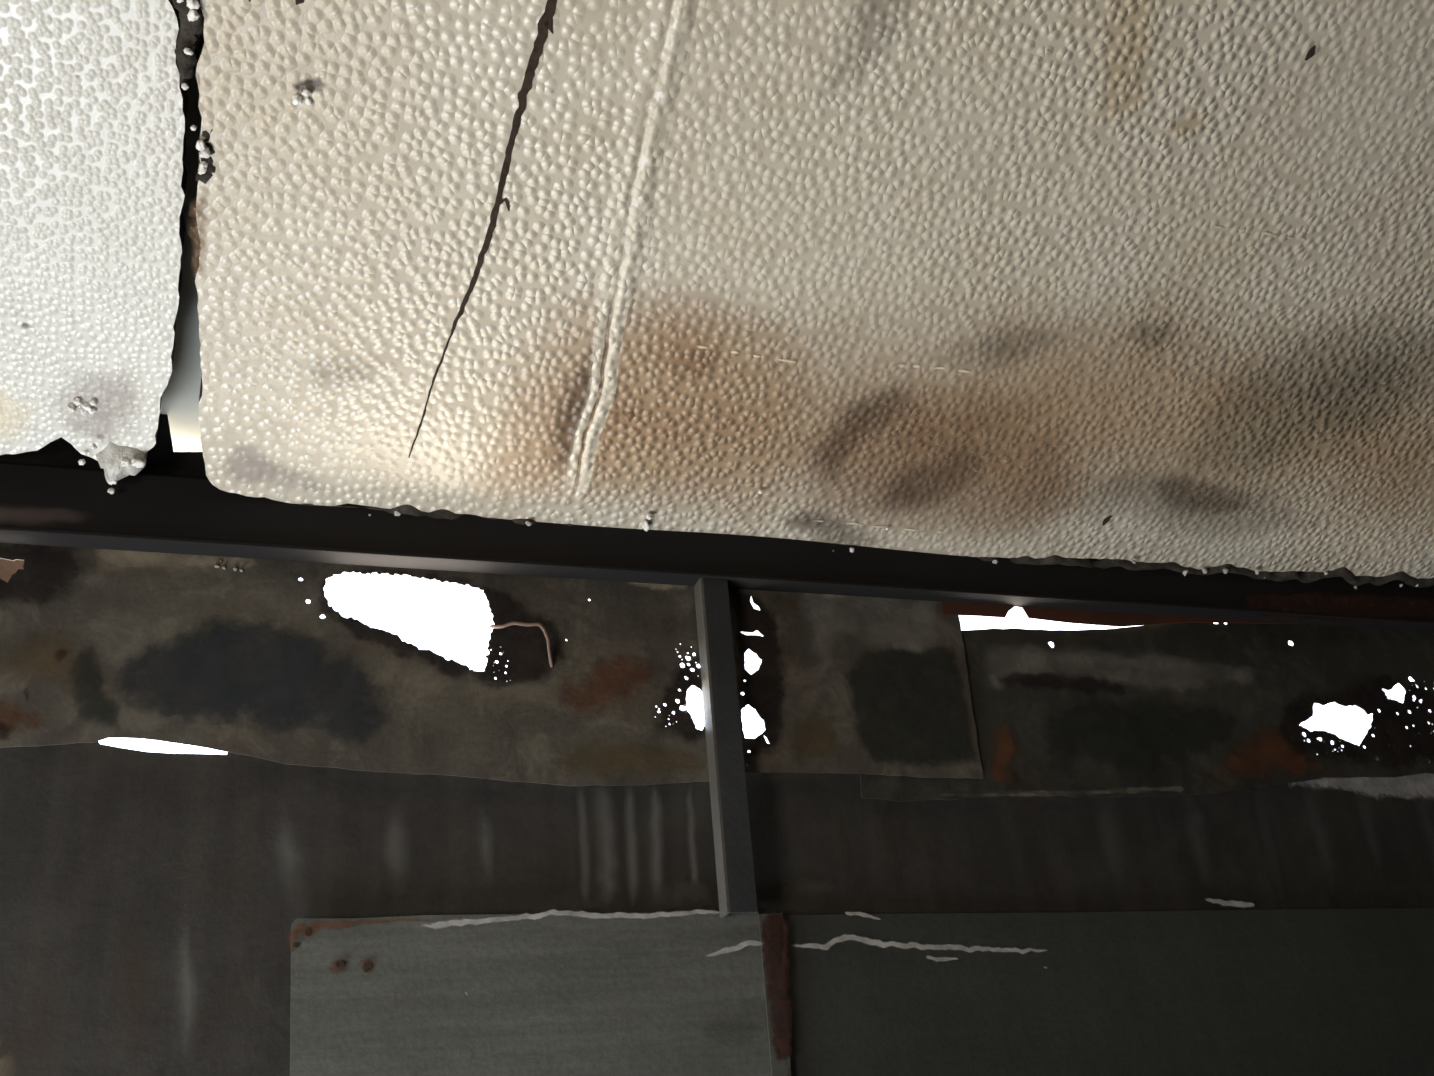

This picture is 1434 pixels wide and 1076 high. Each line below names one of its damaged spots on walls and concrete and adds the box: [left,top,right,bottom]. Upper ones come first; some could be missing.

crack [408,0,557,458]
spalling [78,442,147,494]
damp [824,360,1430,508]
damp [123,621,384,740]
corrosion [762,915,792,1076]